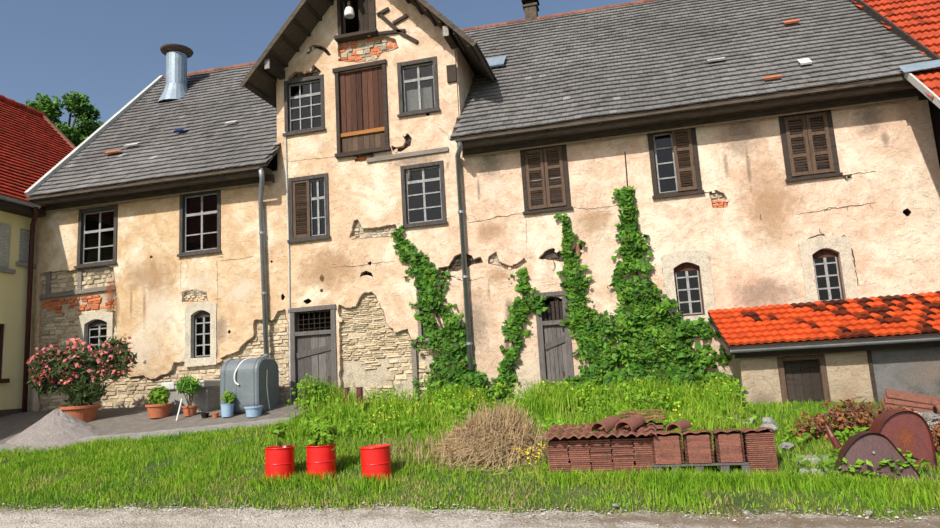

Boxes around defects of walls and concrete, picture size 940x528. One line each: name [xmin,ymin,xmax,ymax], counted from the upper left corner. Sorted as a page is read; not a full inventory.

spalling [306,35,399,62]
spalling [288,66,321,80]
flaking render [709,190,729,208]
spalling [349,220,397,239]
crack [796,202,876,286]
spalling [435,245,584,273]
spalling [39,266,116,362]
spalling [86,309,291,409]
spalling [336,292,441,403]
spalling [39,386,74,411]